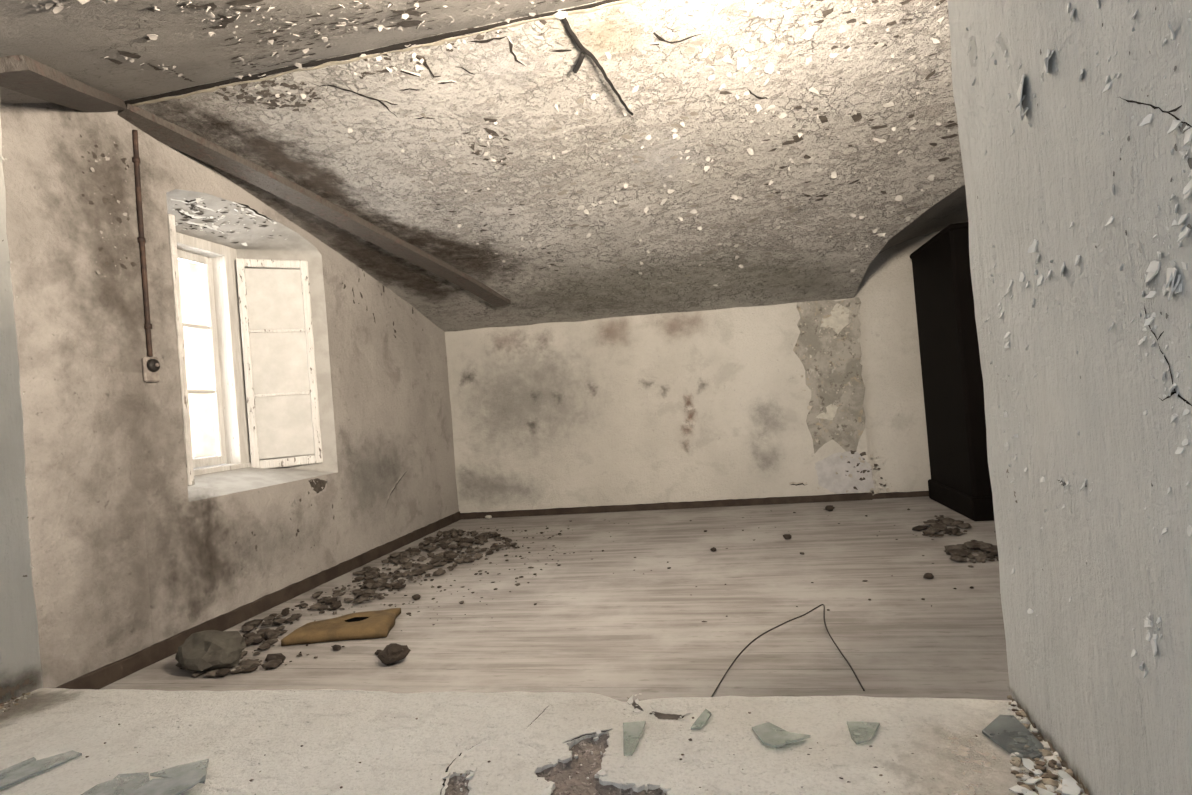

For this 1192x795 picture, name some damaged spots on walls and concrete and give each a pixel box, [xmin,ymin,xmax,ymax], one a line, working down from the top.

peeling [20,0,117,14]
peeling [100,51,194,82]
peeling [176,0,583,112]
crack [124,0,643,119]
crack [650,29,703,45]
crack [1117,97,1192,127]
water stain [211,165,458,300]
water stain [177,112,513,279]
peeling [793,297,892,495]
crack [1144,306,1192,406]
flaking render [441,765,477,795]
flaking render [536,729,671,795]